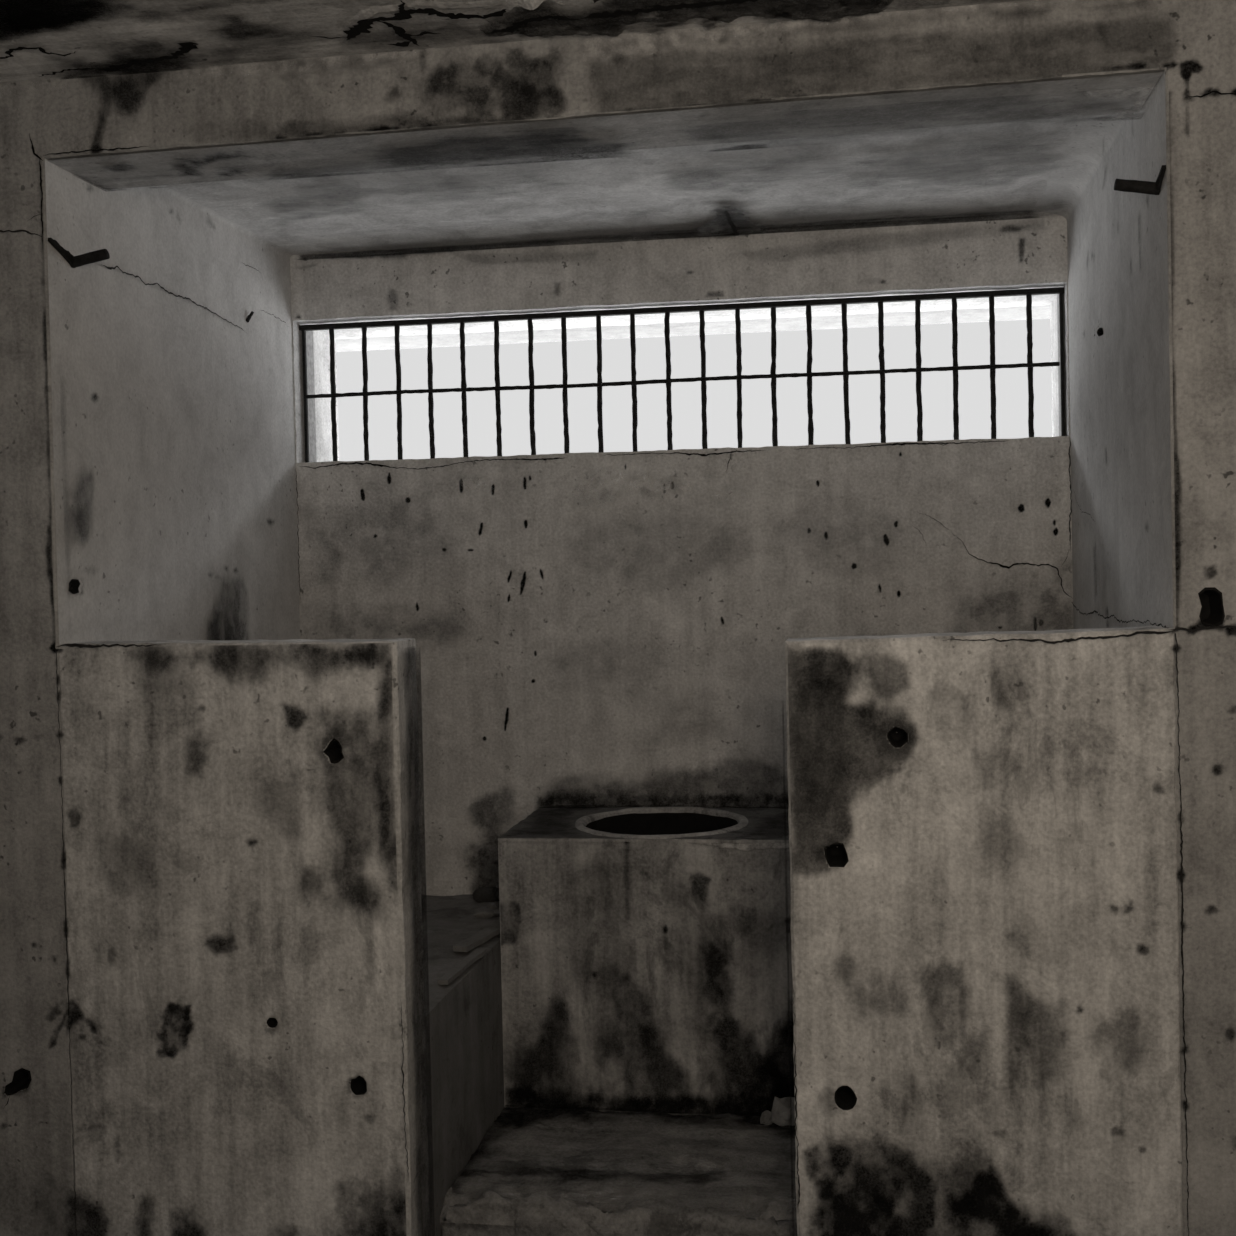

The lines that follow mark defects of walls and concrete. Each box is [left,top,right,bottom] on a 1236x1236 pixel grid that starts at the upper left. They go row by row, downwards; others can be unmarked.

crack [312,0,506,47]
flaking render [482,0,949,38]
crack [0,42,198,77]
damp [432,52,561,120]
crack [101,264,289,331]
damp [144,648,173,668]
damp [196,568,452,1236]
damp [507,649,916,1117]
crack [913,513,1236,1236]
damp [824,1188,897,1236]
damp [951,1175,1049,1236]